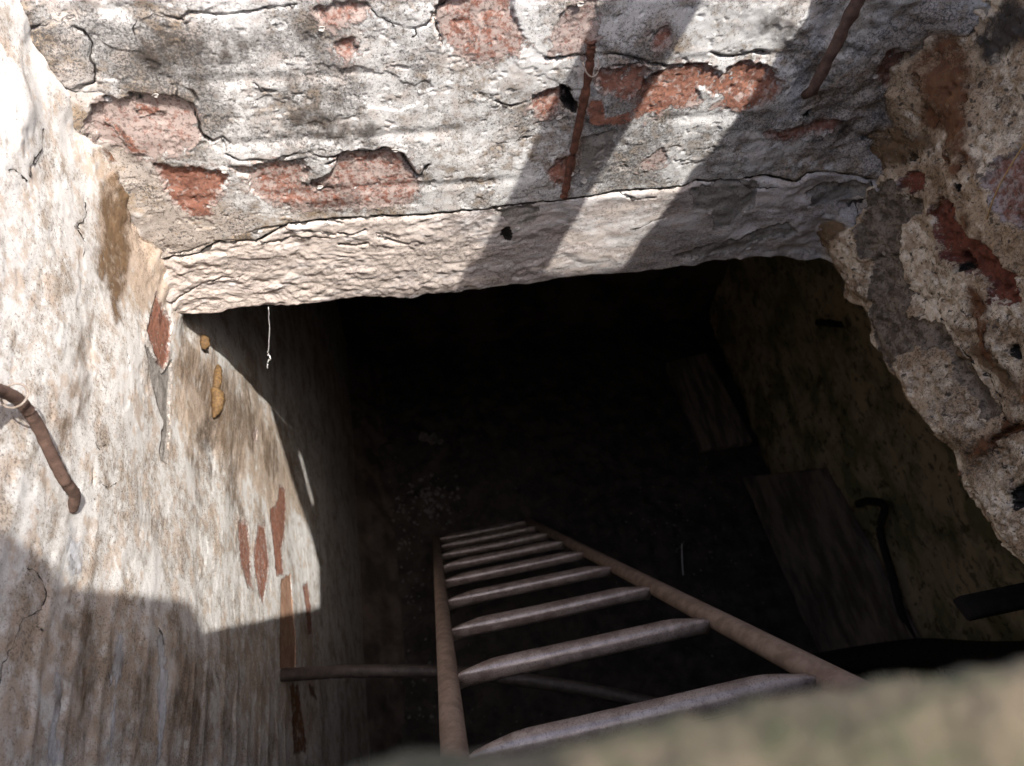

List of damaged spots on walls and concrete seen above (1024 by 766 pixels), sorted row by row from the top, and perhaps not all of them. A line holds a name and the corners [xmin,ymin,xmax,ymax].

crack [30,17,99,93]
spalling [75,87,425,222]
spalling [308,0,373,69]
spalling [422,0,608,69]
crack [164,171,876,260]
rust [560,40,599,200]
spalling [545,20,790,188]
rust [801,0,865,100]
spalling [979,144,1024,236]
peeling [804,171,1023,422]
peeling [145,291,175,464]
peeling [237,485,312,668]